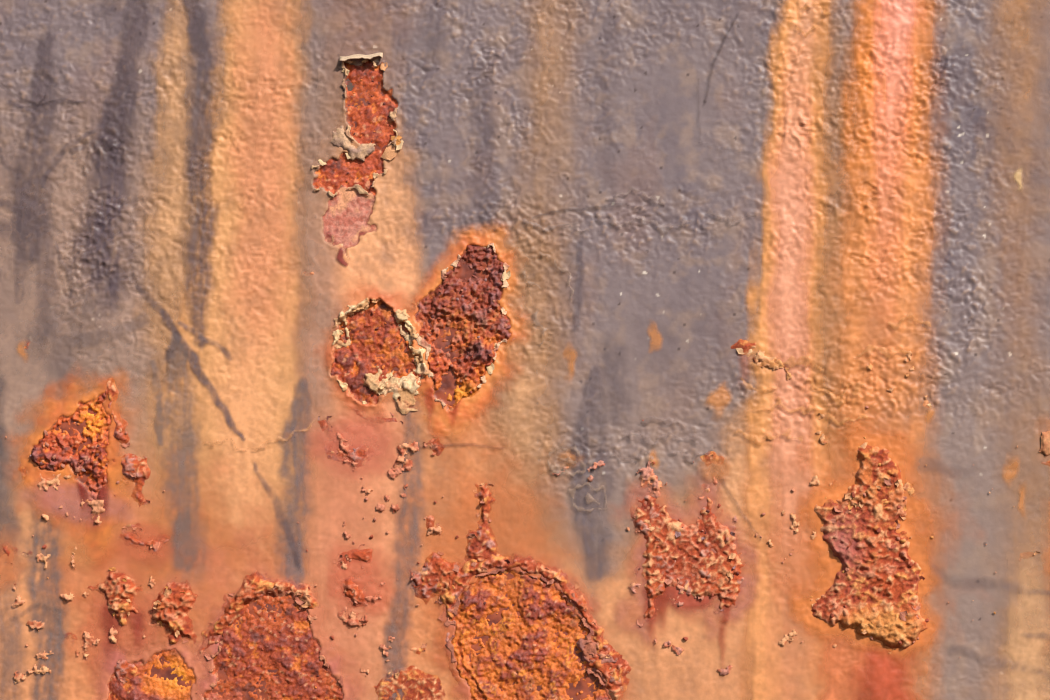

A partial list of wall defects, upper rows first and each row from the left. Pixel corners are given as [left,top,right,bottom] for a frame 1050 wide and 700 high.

leakage [9,33,52,261]
leakage [84,0,149,296]
peeling [311,53,404,266]
leakage [160,203,244,439]
rust [0,0,422,700]
peeling [326,228,524,436]
rust [373,0,935,700]
rust [1039,431,1050,466]
rust [1009,628,1043,700]